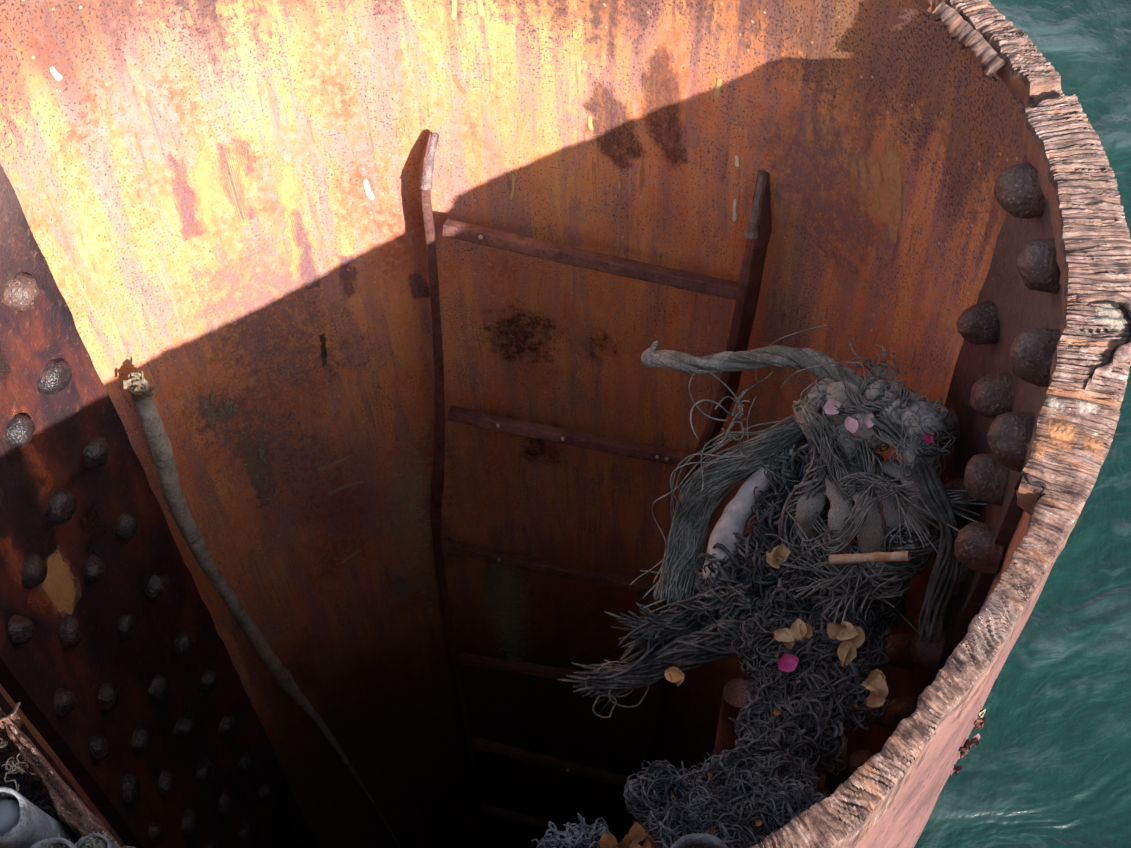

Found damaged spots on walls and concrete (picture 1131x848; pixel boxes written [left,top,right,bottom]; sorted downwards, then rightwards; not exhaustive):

rust [932,1,1006,81]
rust [585,84,642,168]
rust [644,49,686,163]
rust [170,140,254,240]
rust [199,160,350,396]
rust [340,256,356,296]
rust [409,273,430,298]
rust [484,309,555,363]
rust [21,436,54,497]
rust [0,536,77,615]